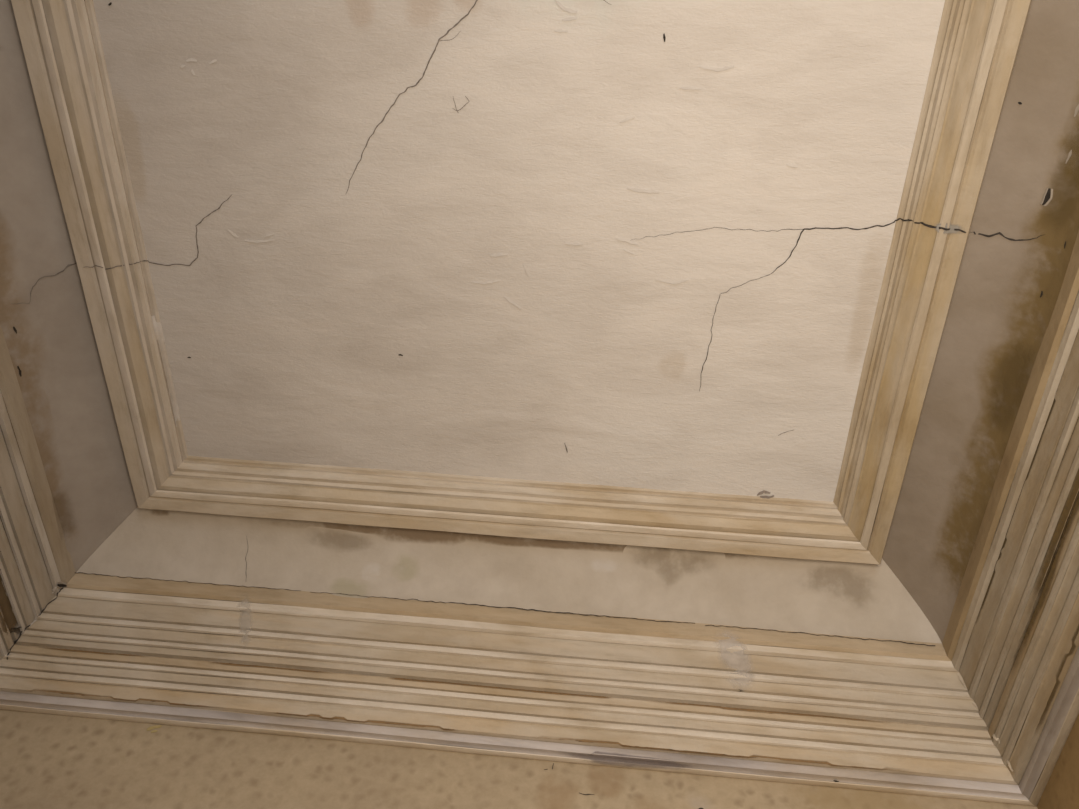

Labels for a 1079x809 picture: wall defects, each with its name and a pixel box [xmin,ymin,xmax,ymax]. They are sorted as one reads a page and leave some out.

crack [346,0,478,193]
water stain [0,205,83,555]
crack [18,197,230,304]
crack [632,218,1045,391]
water stain [927,57,1079,640]
spalling [1040,188,1053,206]
water stain [1040,626,1079,722]